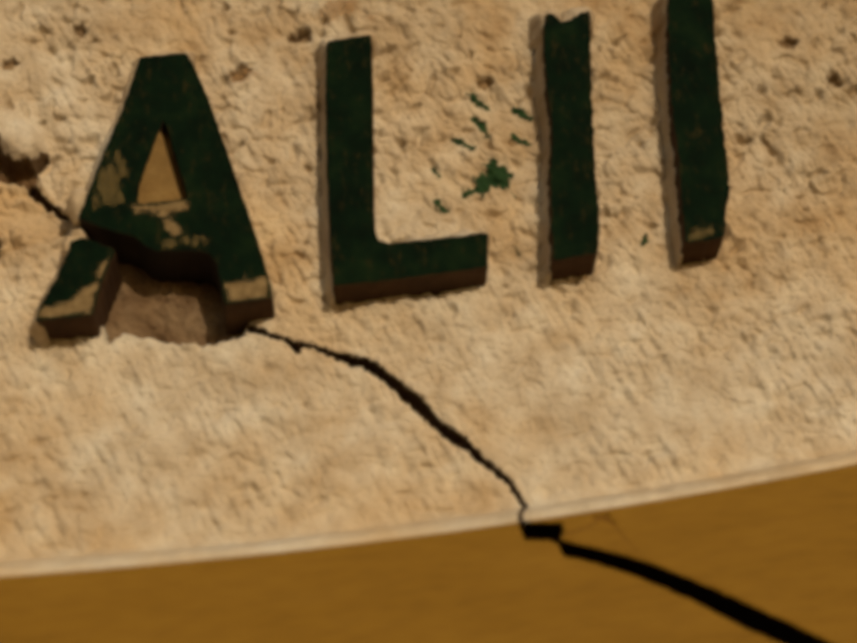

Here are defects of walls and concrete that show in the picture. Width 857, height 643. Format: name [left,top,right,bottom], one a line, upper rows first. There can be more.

spalling [228,63,253,81]
crack [26,185,71,221]
spalling [0,136,269,347]
crack [247,324,829,643]